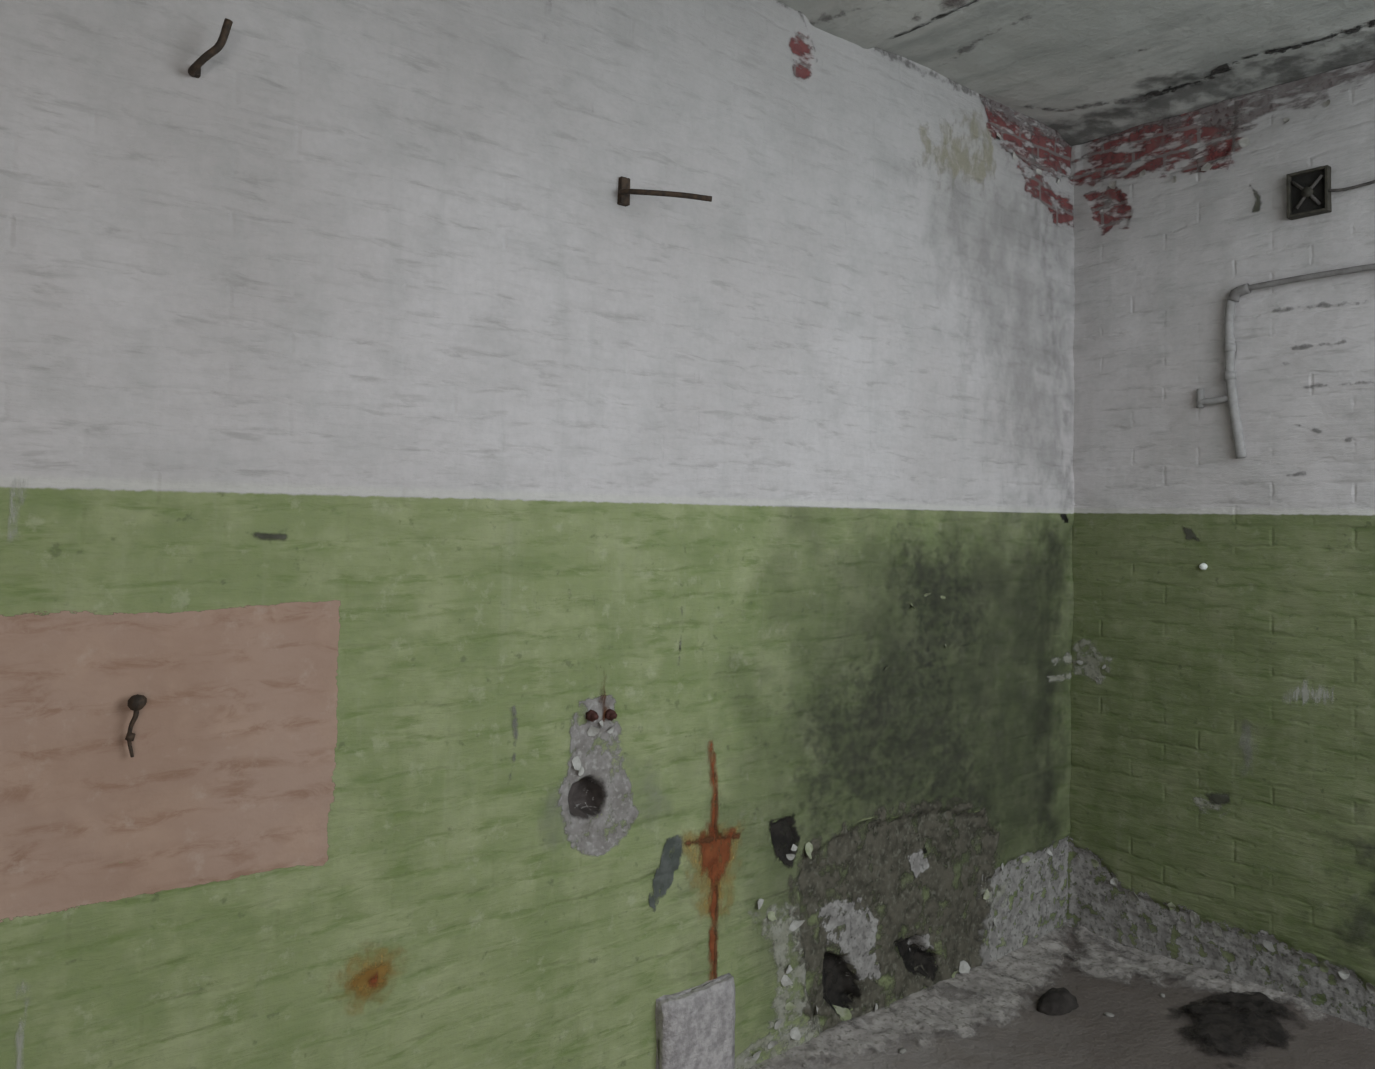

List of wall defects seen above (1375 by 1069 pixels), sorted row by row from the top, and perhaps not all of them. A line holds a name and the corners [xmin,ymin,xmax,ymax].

flaking render [789,32,812,79]
flaking render [980,59,1375,235]
peeling [572,756,584,776]
rust [347,951,394,999]
rust [685,742,740,980]
flaking render [734,797,1375,1069]